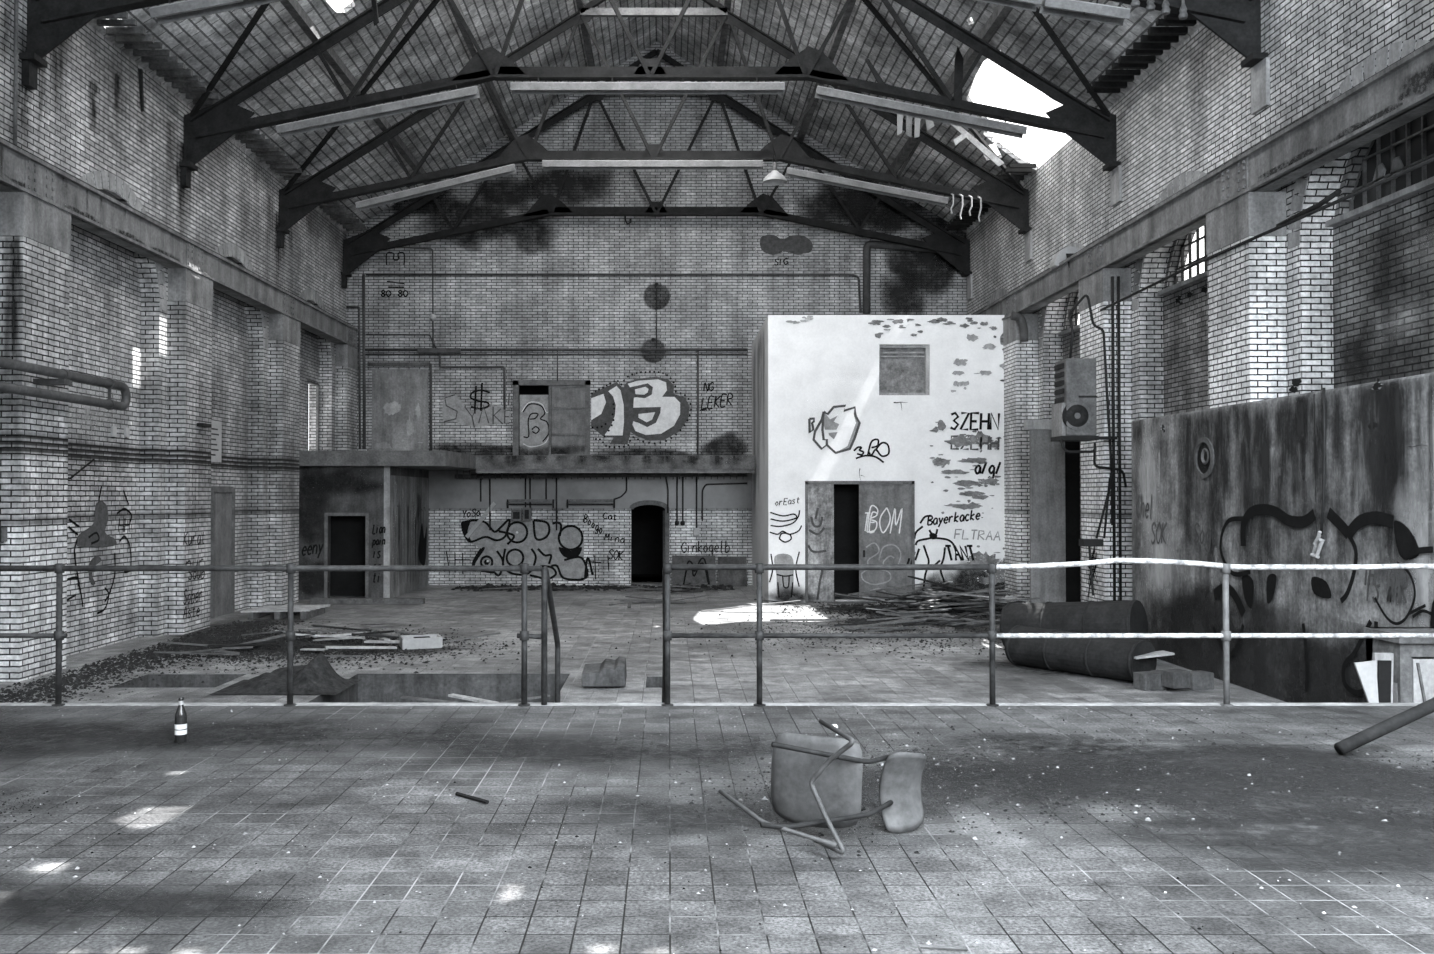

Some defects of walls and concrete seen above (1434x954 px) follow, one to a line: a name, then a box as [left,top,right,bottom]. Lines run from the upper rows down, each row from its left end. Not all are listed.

peeling [868,317,1004,392]
peeling [930,420,1002,514]
water stain [1135,383,1434,703]